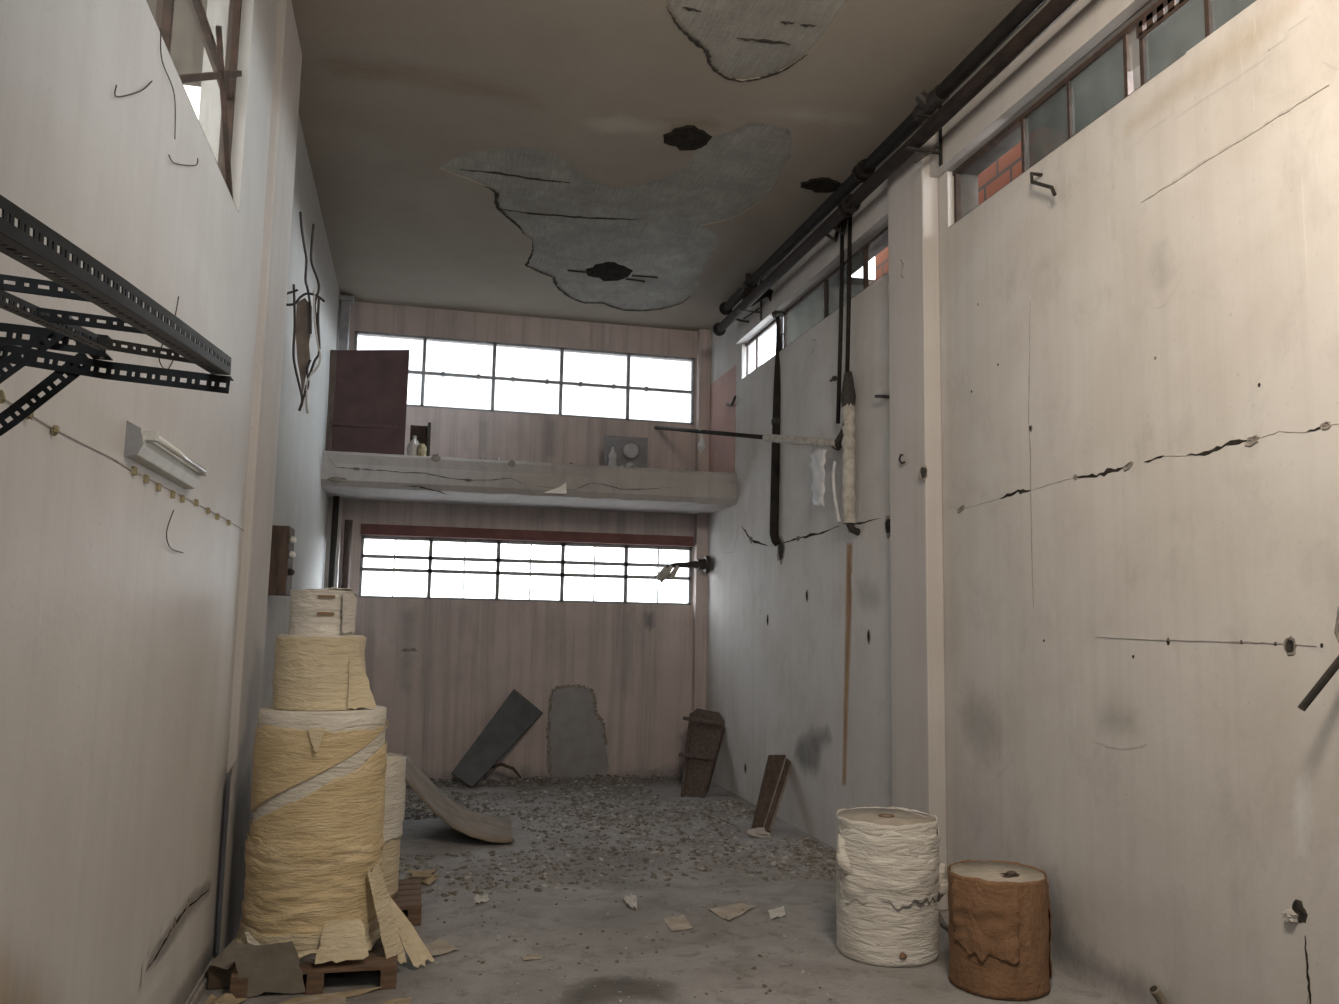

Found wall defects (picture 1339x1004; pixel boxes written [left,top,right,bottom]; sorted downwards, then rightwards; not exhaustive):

spalling [663,125,712,151]
spalling [567,262,658,282]
crack [952,319,1336,608]
crack [727,518,880,553]
crack [1101,637,1310,646]
crack [1304,937,1312,1004]